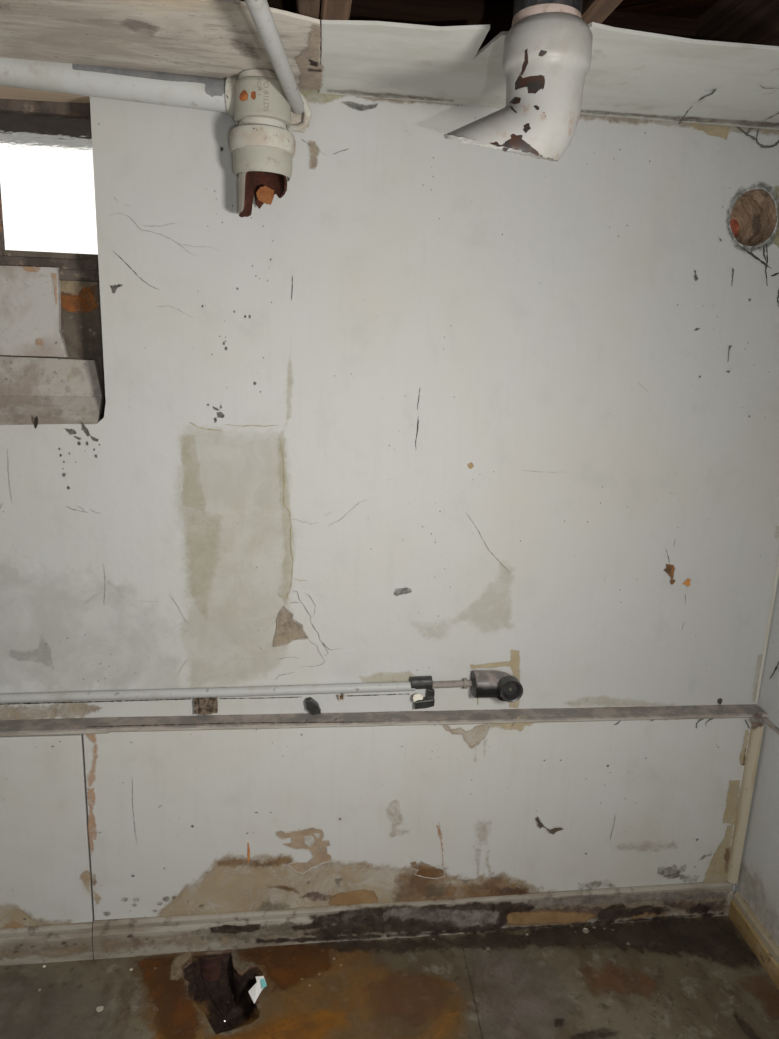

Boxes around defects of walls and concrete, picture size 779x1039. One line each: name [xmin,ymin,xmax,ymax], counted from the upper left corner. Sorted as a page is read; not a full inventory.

rust [256,186,274,205]
crack [190,422,362,680]
spalling [273,606,308,647]
peeling [276,827,331,874]
peeling [410,861,445,879]
leakage [0,908,50,929]
leakage [155,780,779,1039]